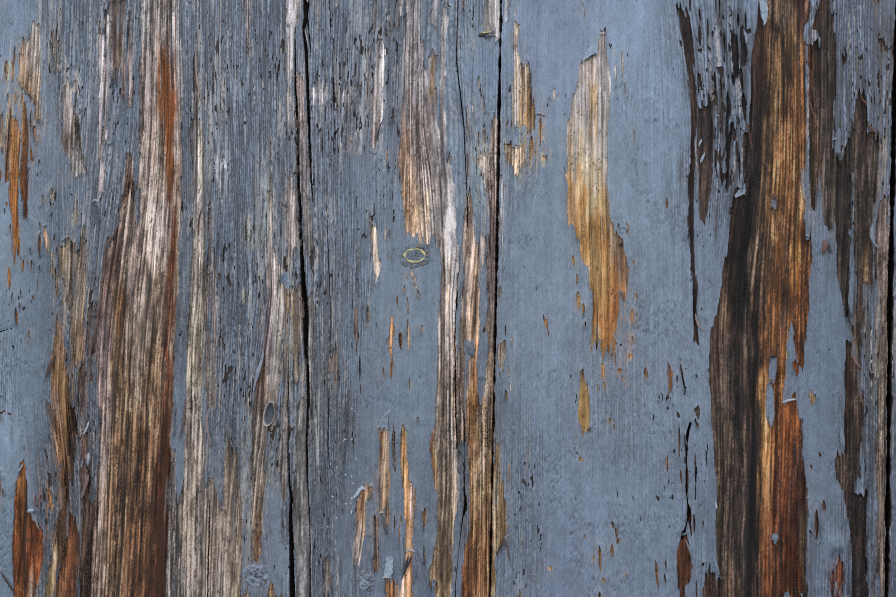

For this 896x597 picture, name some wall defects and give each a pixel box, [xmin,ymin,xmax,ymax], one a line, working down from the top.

peeling [0,0,547,597]
crack [287,0,332,597]
peeling [564,27,638,435]
peeling [593,521,620,597]
peeling [655,0,890,597]